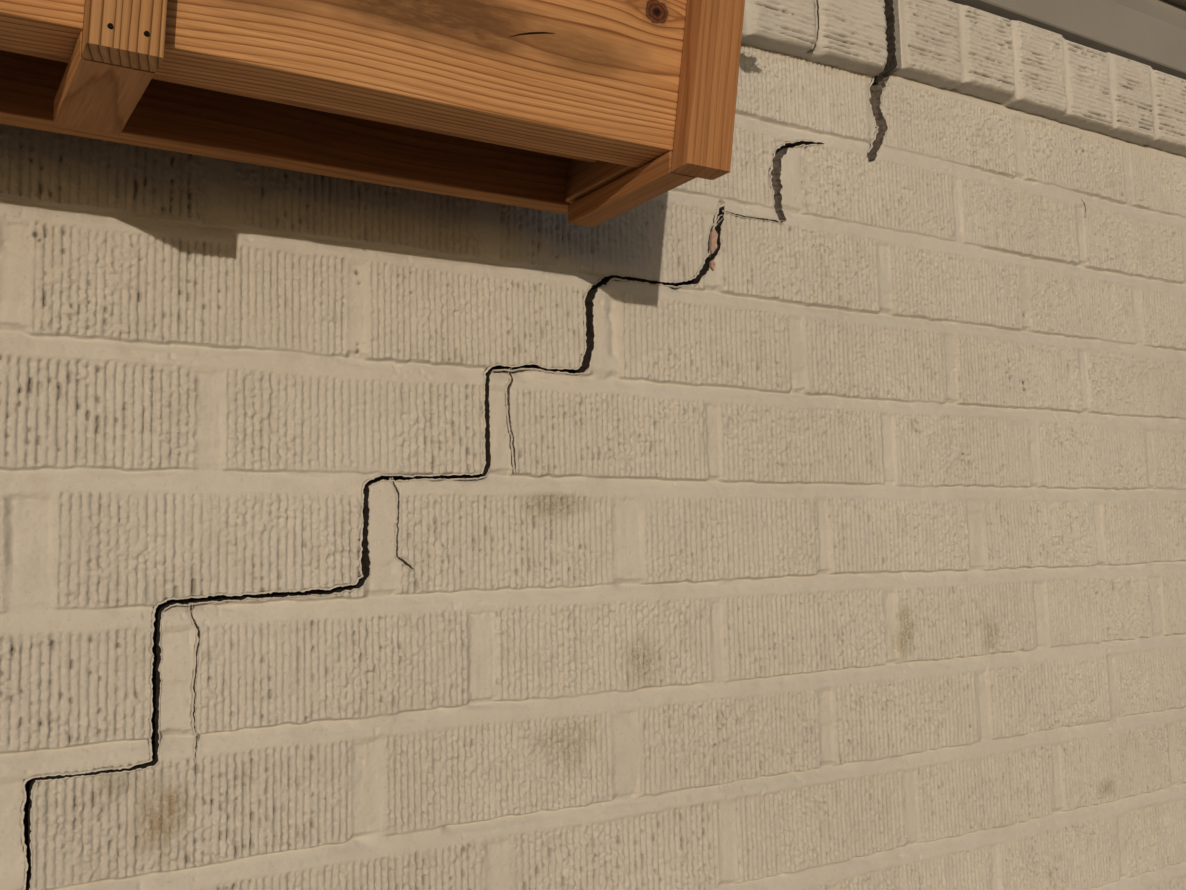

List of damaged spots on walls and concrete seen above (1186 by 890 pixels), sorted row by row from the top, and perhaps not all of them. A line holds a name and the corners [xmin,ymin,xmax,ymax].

crack [808,0,820,53]
crack [867,70,890,160]
crack [20,140,824,890]